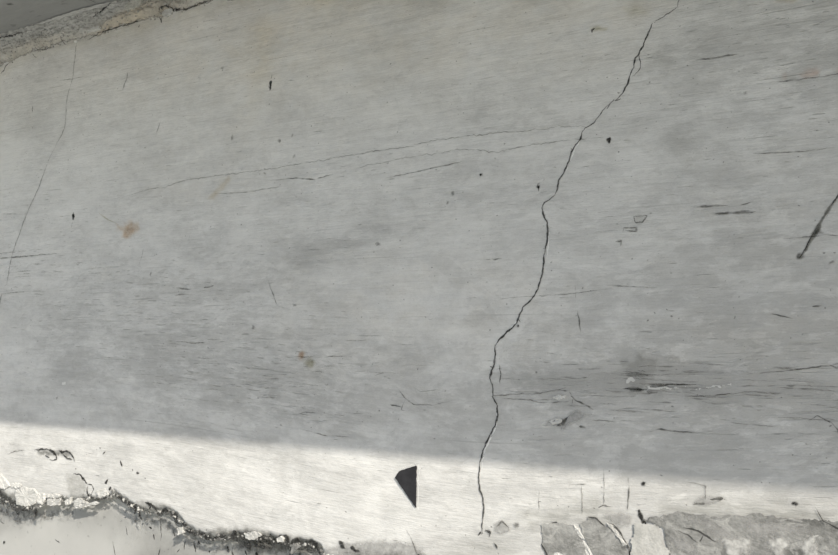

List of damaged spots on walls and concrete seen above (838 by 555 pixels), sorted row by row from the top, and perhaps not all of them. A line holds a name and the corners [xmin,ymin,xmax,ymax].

crack [368,0,679,548]
spalling [0,448,421,555]
peeling [541,487,838,555]